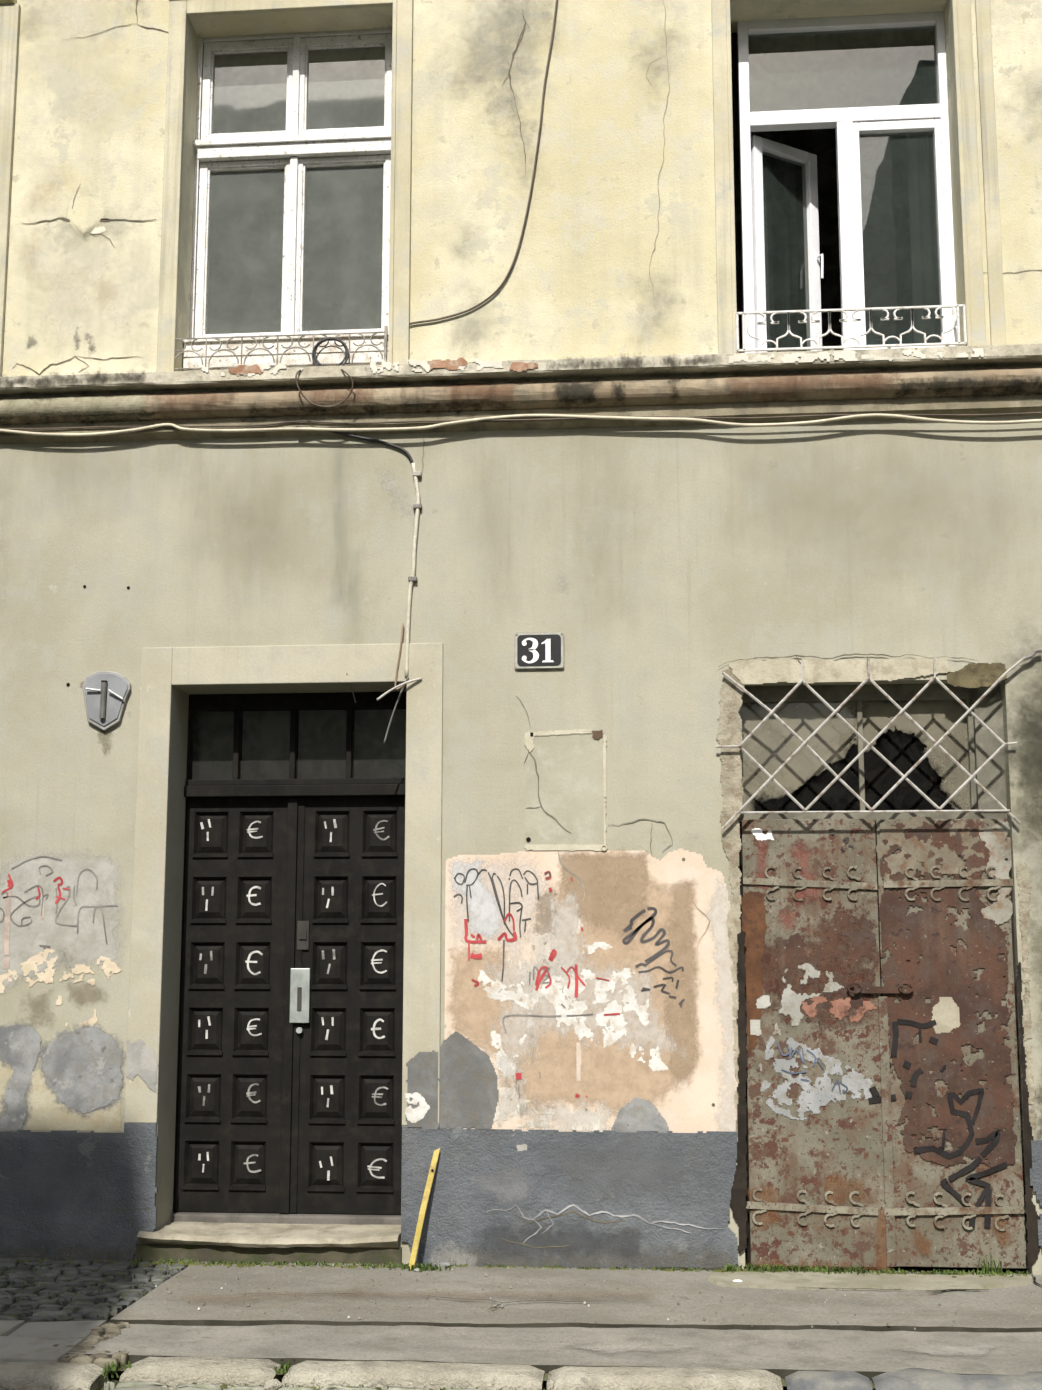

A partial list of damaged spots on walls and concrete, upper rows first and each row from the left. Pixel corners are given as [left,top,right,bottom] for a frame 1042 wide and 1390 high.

crack [65,0,168,40]
crack [503,9,531,173]
crack [23,185,156,246]
crack [13,356,139,375]
peeling [370,357,538,373]
crack [516,696,585,900]
spalling [716,658,1007,1136]
peeling [0,948,122,1005]
peeling [478,915,668,1132]
corrosion [741,818,1017,1167]
peeling [27,1068,121,1133]
corrosion [748,1190,777,1226]